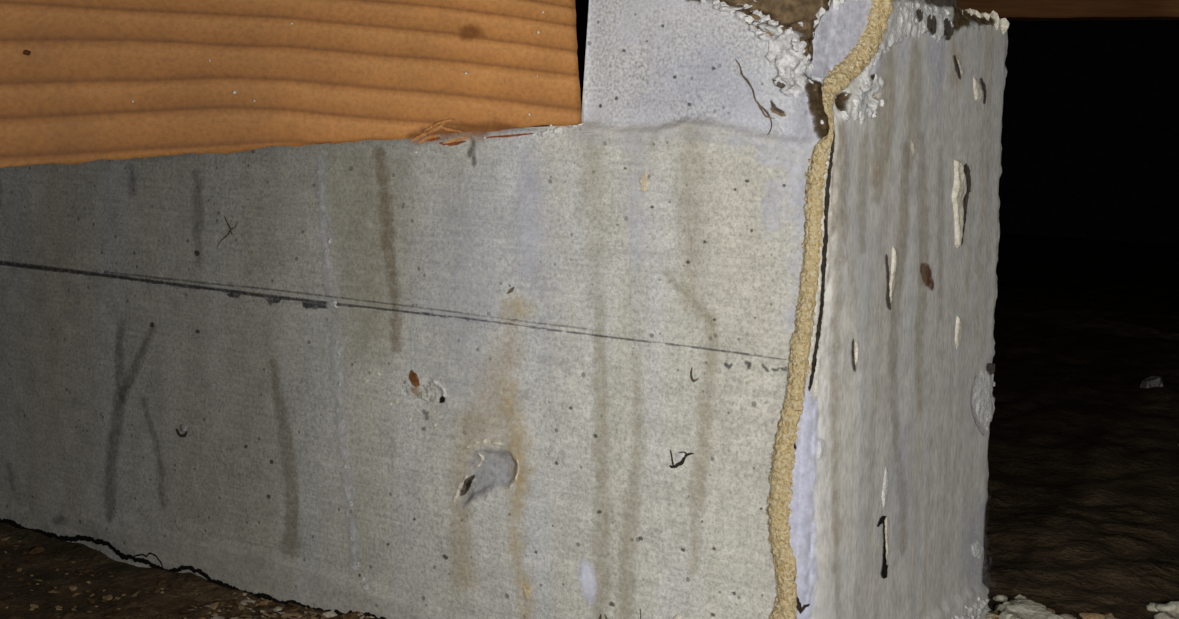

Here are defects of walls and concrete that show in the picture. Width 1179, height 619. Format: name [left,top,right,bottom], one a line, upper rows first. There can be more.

spalling [953,3,1009,34]
spalling [687,0,872,117]
peeling [954,55,987,104]
rust [409,370,420,394]
spalling [453,439,520,506]